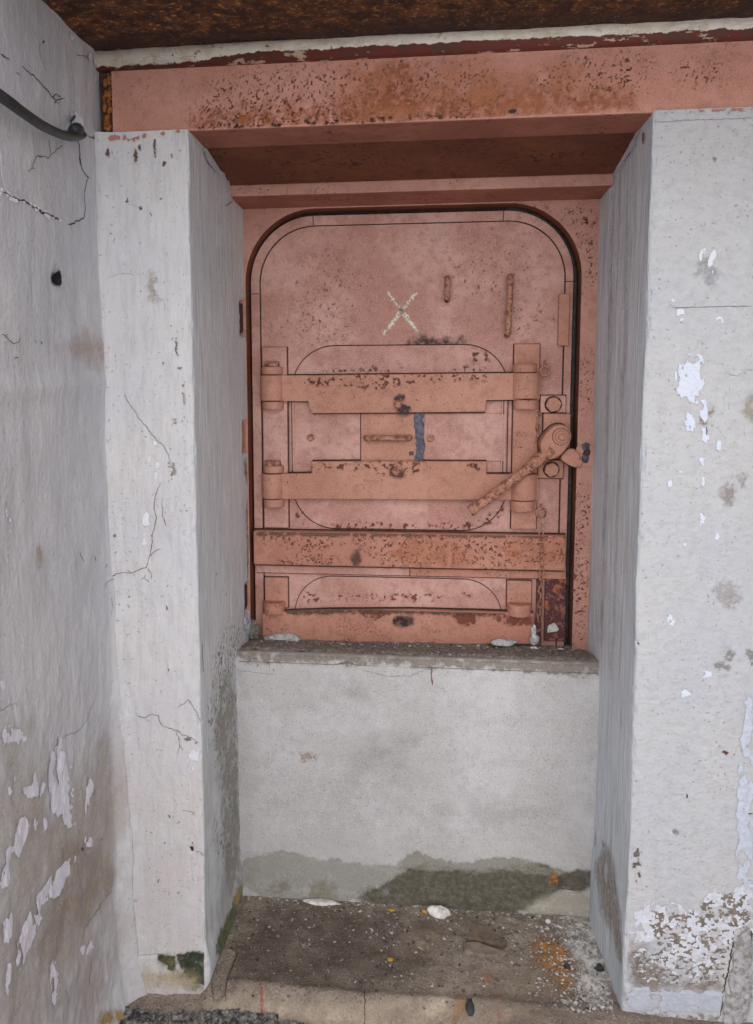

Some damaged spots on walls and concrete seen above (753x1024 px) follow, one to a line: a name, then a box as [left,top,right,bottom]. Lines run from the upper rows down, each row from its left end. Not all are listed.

crack [2,43,64,103]
rust [198,49,653,129]
crack [0,130,98,225]
peeling [675,353,722,451]
crack [80,485,166,615]
rust [264,496,590,640]
peeling [3,856,76,995]
peeling [0,734,94,889]
peeling [50,959,59,1005]
crack [137,701,201,754]
leakage [209,631,563,901]
spalling [594,697,753,1024]